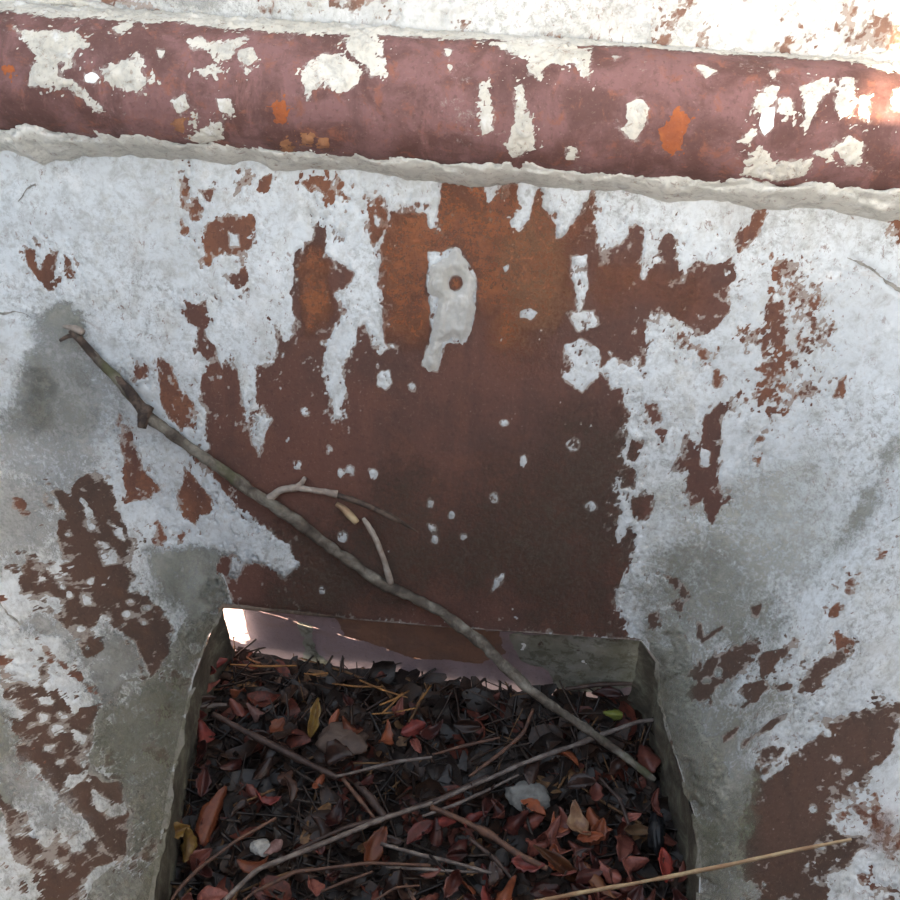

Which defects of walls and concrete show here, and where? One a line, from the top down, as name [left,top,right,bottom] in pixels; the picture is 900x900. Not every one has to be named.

rust [651,0,719,49]
rust [774,0,900,55]
rust [267,94,330,152]
peeling [566,146,579,160]
peeling [736,119,758,152]
rust [884,220,900,245]
water stain [0,301,123,566]
rust [0,160,853,900]
water stain [145,544,228,623]
water stain [0,709,78,831]
water stain [20,613,164,814]
rust [644,566,900,900]